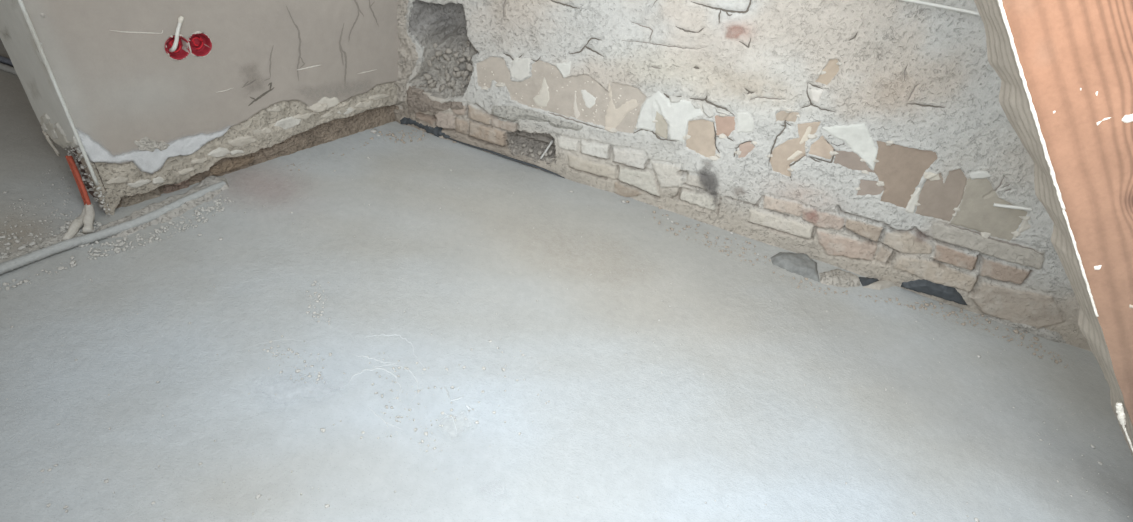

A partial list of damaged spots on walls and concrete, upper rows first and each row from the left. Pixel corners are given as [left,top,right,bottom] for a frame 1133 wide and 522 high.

crack [242,6,305,106]
flaking render [40,0,647,215]
crack [339,0,379,86]
crack [550,113,605,130]
flaking render [652,111,668,139]
crack [569,0,835,181]
flaking render [683,104,757,161]
flaking render [767,109,1030,241]